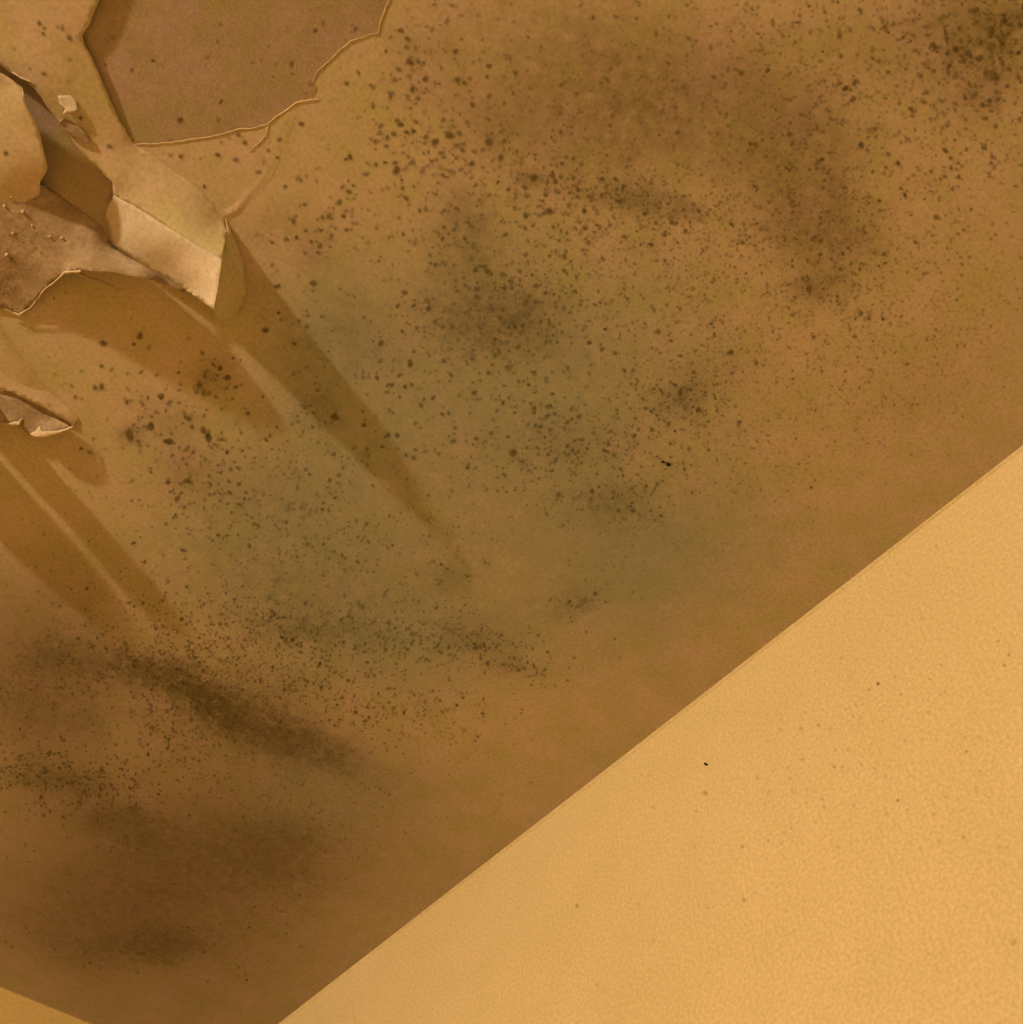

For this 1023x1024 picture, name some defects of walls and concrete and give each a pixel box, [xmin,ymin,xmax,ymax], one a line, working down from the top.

peeling [82,0,390,152]
peeling [10,74,123,253]
peeling [0,372,79,437]
damp [0,717,161,831]